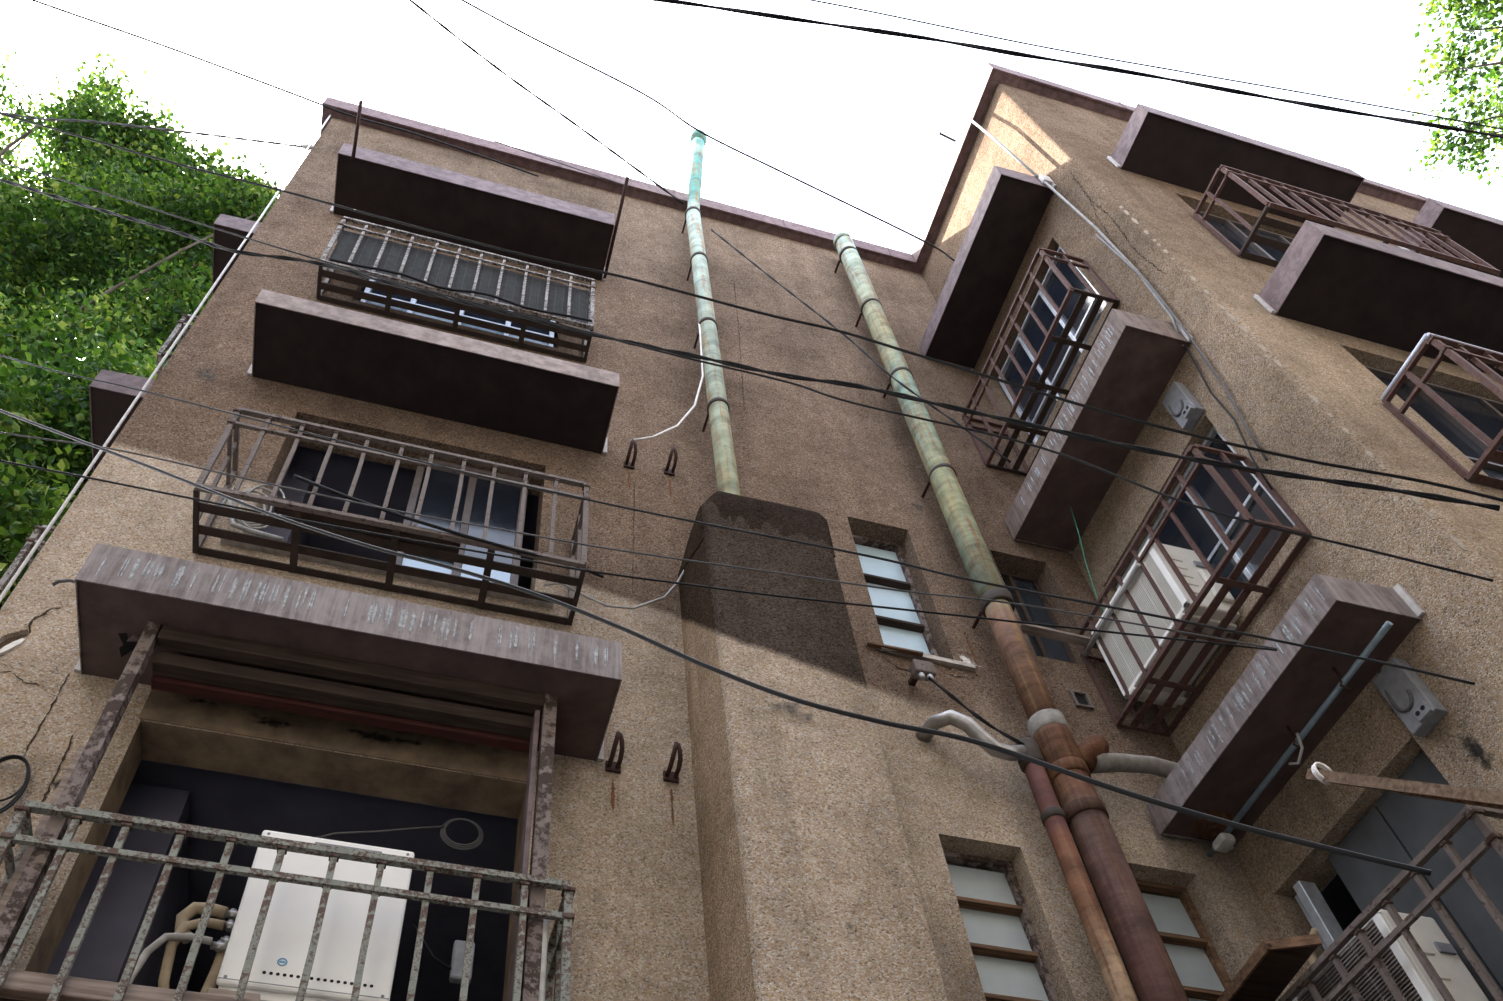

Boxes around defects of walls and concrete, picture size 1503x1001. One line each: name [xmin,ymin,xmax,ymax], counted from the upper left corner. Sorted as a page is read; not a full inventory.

crack [0,671,73,802]